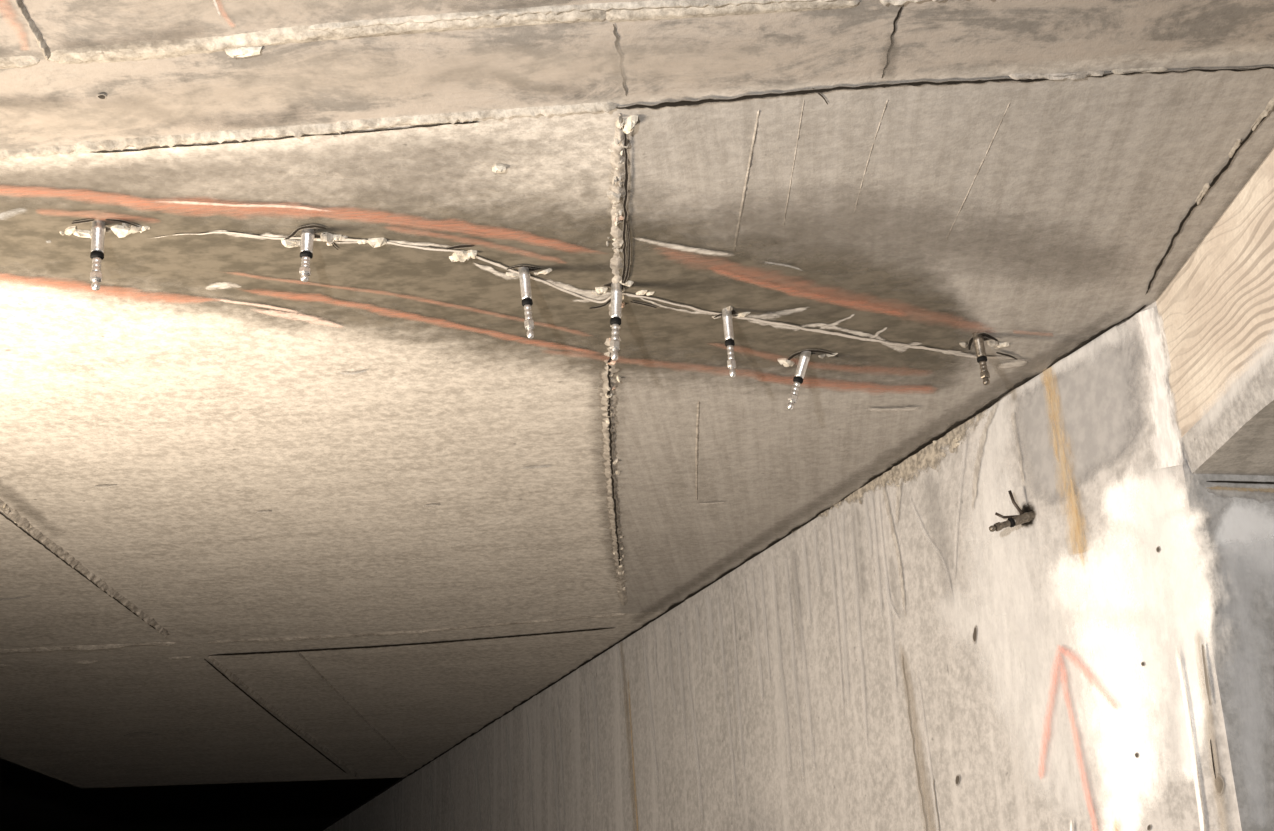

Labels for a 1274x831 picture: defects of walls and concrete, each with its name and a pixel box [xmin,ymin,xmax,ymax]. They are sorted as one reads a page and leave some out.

crack [613,7,1274,110]
damp [492,164,506,173]
damp [0,188,974,385]
crack [155,97,1274,831]